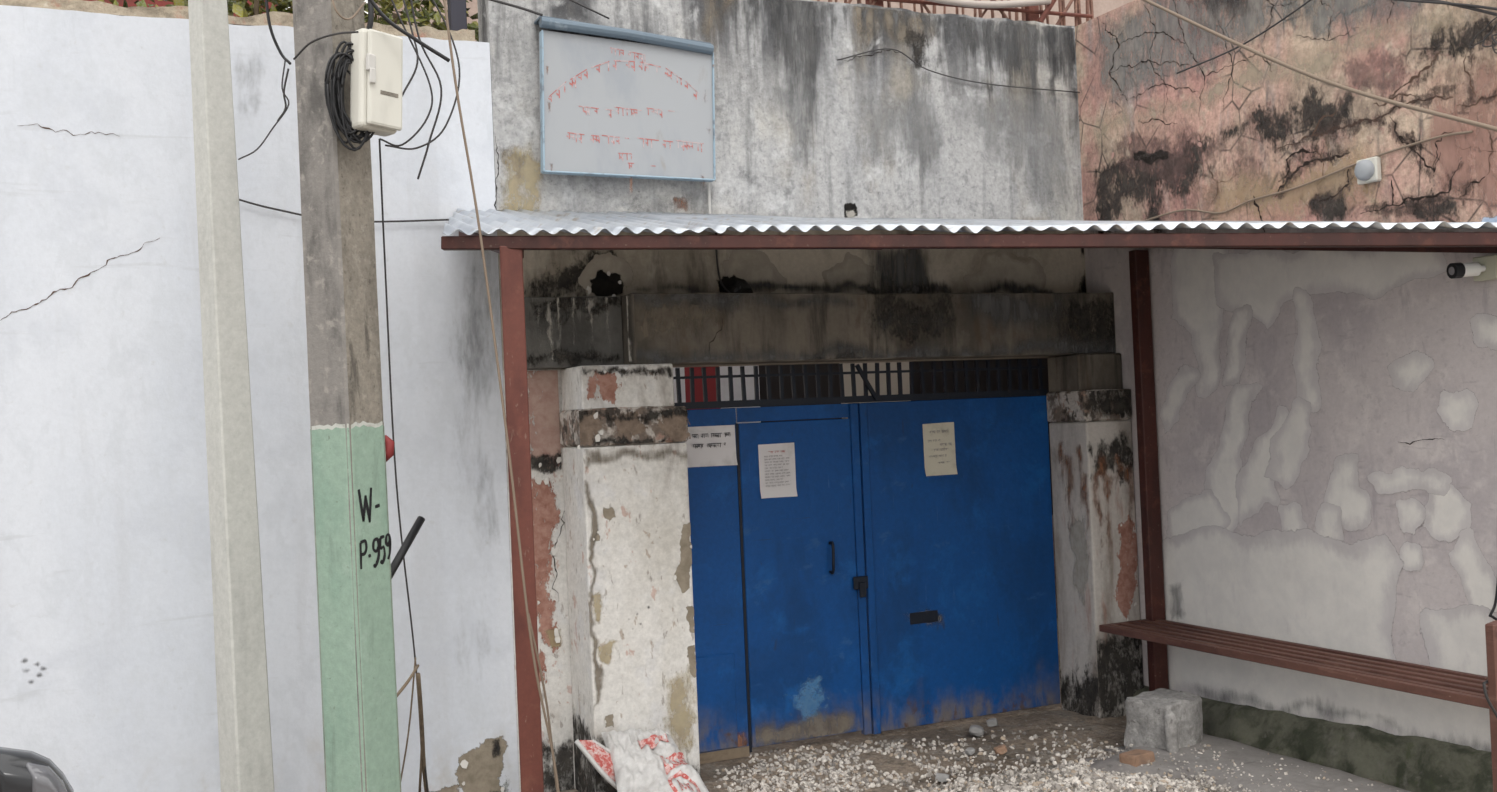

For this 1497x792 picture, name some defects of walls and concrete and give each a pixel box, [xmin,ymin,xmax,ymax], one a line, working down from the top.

crack [1,238,159,320]
water stain [524,249,1116,377]
water stain [706,0,1075,197]
water stain [1094,28,1382,234]
crack [1103,0,1394,125]
crack [1207,50,1497,232]
mould [1402,189,1457,222]
peeling [585,482,619,727]
peeling [527,369,691,685]
peeling [673,519,697,678]
peeling [1114,514,1138,621]
flaking render [429,736,508,792]